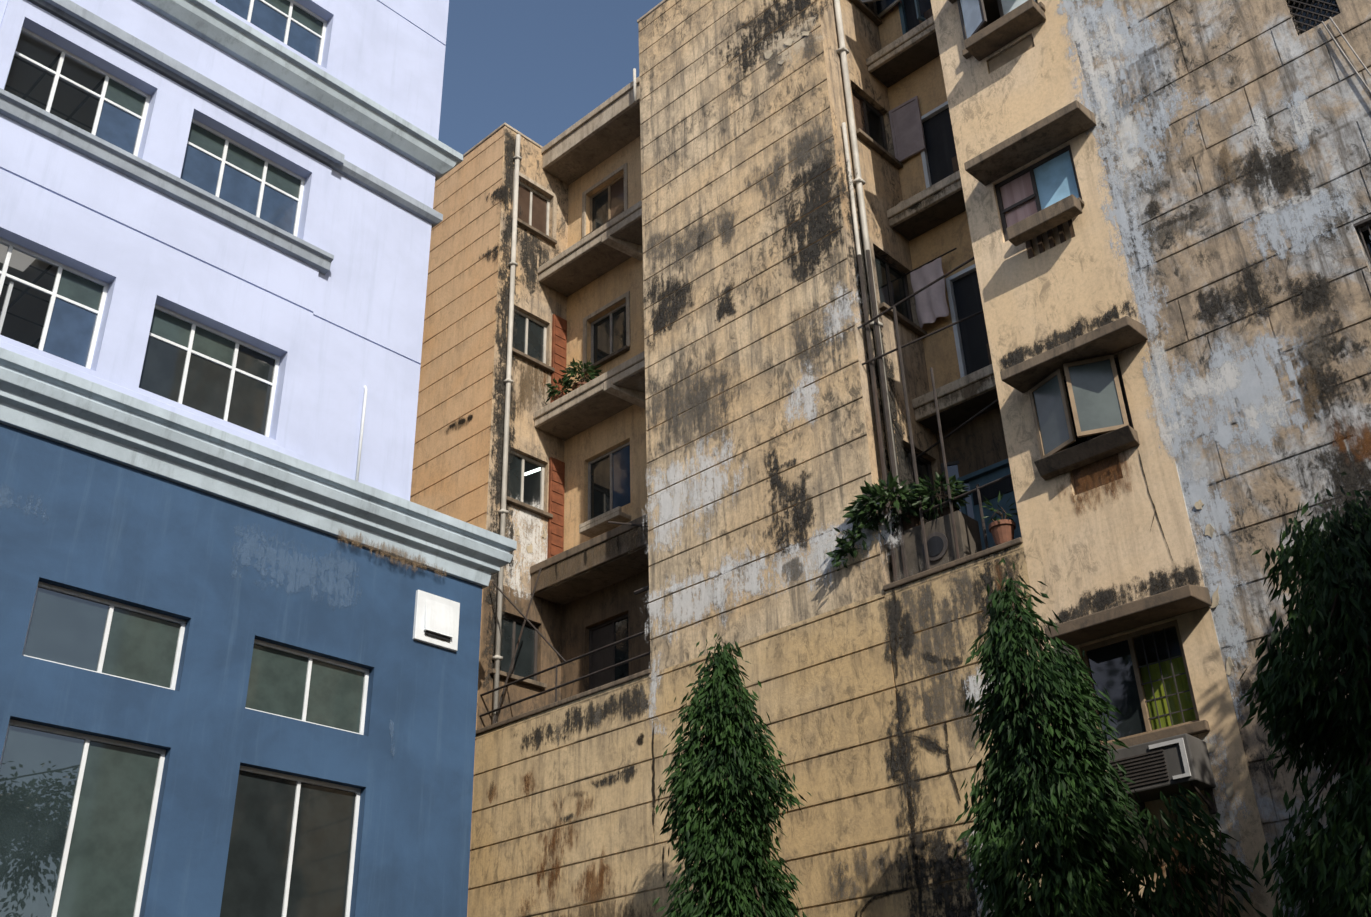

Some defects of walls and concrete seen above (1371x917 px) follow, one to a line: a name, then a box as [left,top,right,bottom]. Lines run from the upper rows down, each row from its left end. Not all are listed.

water stain [719,0,832,98]
water stain [999,0,1371,486]
water stain [533,135,914,641]
water stain [514,654,665,750]
water stain [902,548,1025,719]
water stain [1044,566,1207,630]